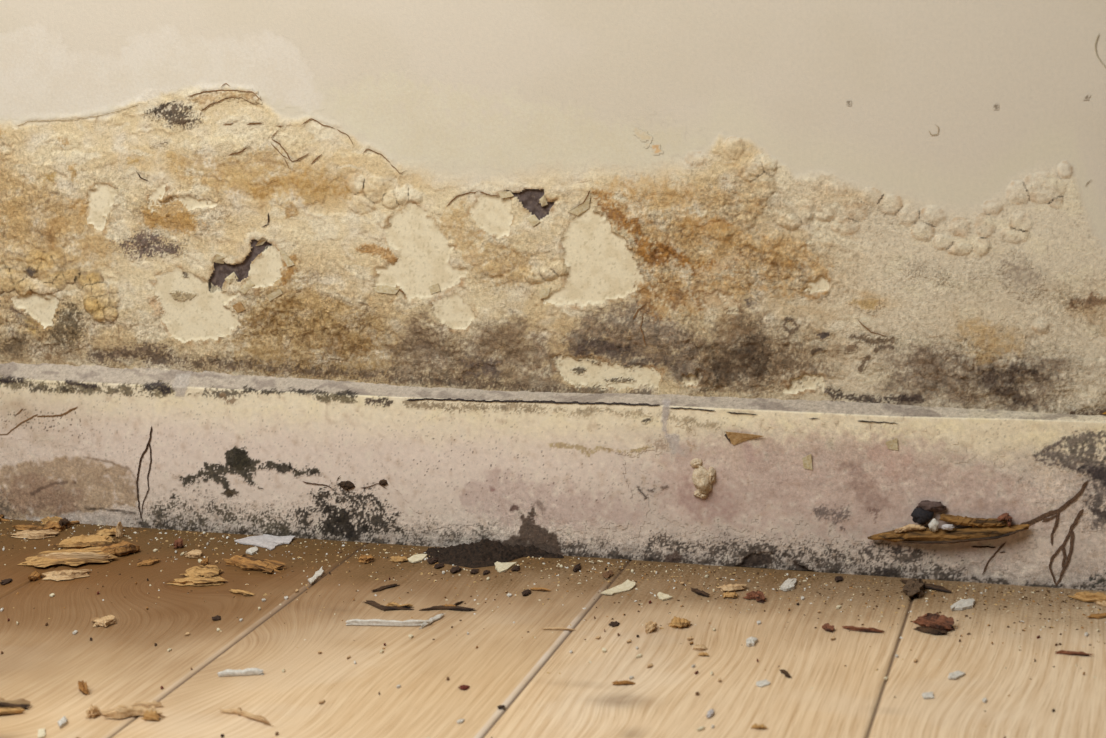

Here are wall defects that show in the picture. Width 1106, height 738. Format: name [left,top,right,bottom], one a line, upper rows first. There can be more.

flaking render [155,240,295,343]
crack [188,83,405,174]
damp [0,21,711,320]
flaking render [372,203,475,330]
flaking render [470,189,554,239]
flaking render [539,194,644,307]
crack [0,406,78,435]
damp [0,194,1106,591]
crack [136,426,152,521]
peeling [928,518,955,532]
crack [972,480,1088,586]